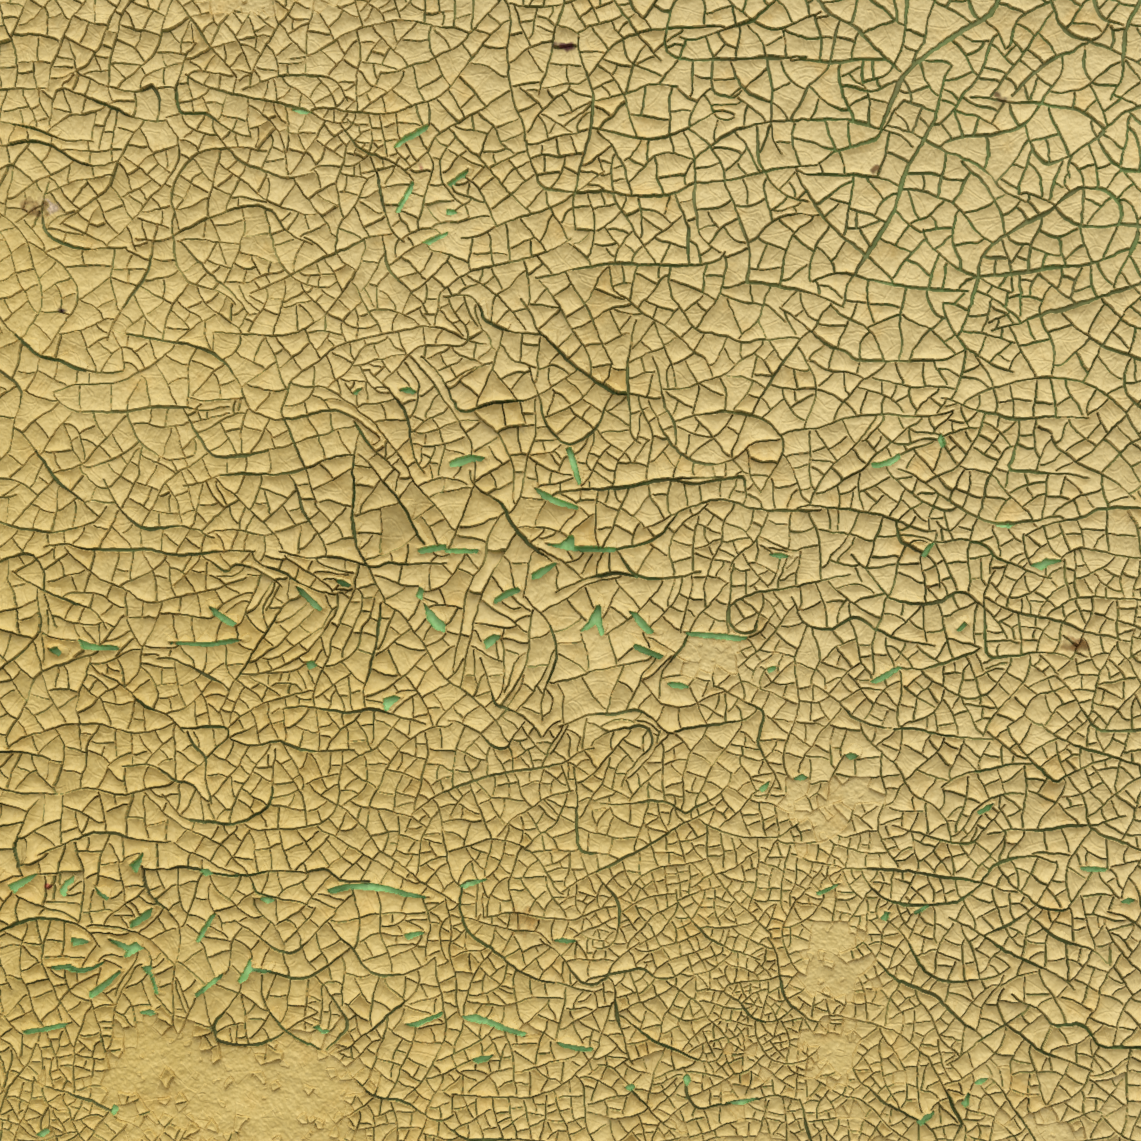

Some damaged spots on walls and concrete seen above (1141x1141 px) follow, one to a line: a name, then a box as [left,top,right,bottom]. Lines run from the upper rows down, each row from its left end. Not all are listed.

peeling [439,422,501,492]
peeling [385,434,750,707]
crack [502,650,522,693]
peeling [0,838,288,1025]
peeling [381,919,430,946]
crack [0,955,151,1141]
peeling [393,995,445,1041]
peeling [462,1000,526,1037]
crack [799,993,847,1030]
crack [673,1081,745,1141]
crack [973,1070,1036,1141]
crack [1116,1108,1141,1141]